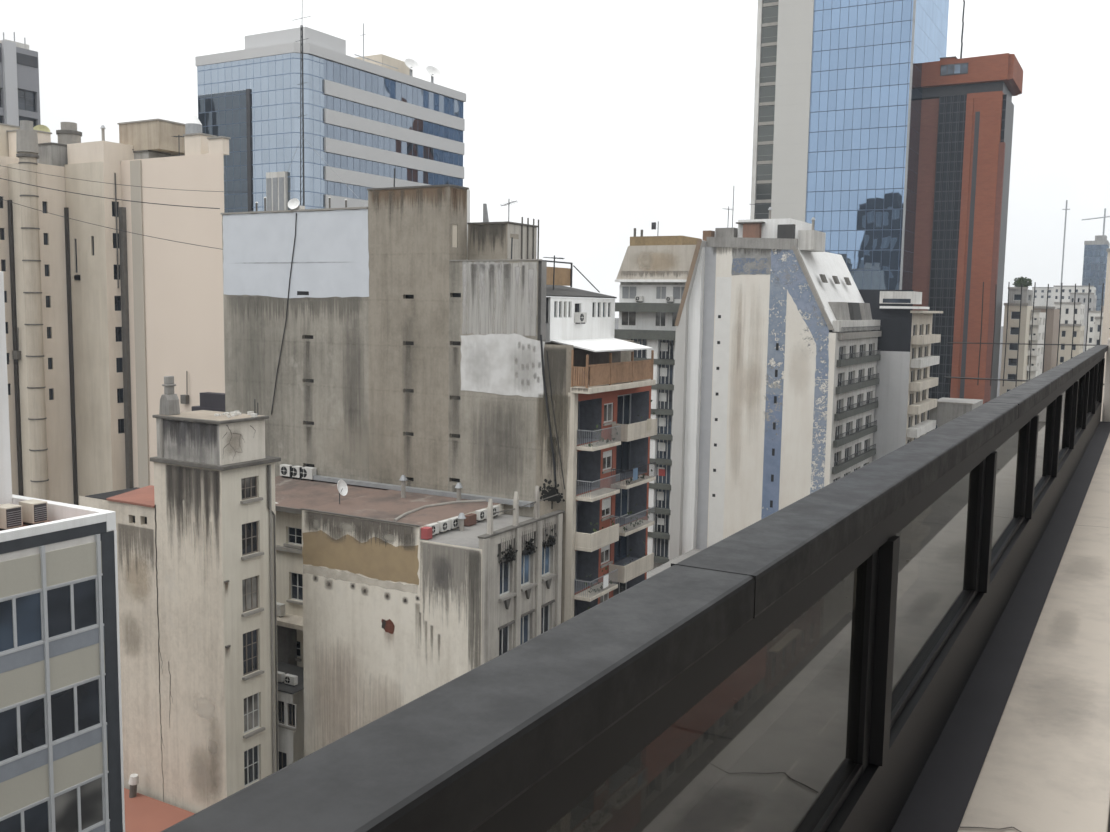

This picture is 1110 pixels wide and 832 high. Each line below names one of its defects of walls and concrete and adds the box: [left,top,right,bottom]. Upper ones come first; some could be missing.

crack [155,505,173,801]
water stain [167,465,218,544]
peeling [302,530,419,603]
water stain [306,511,481,668]
peeling [761,367,783,519]
peeling [810,379,828,494]